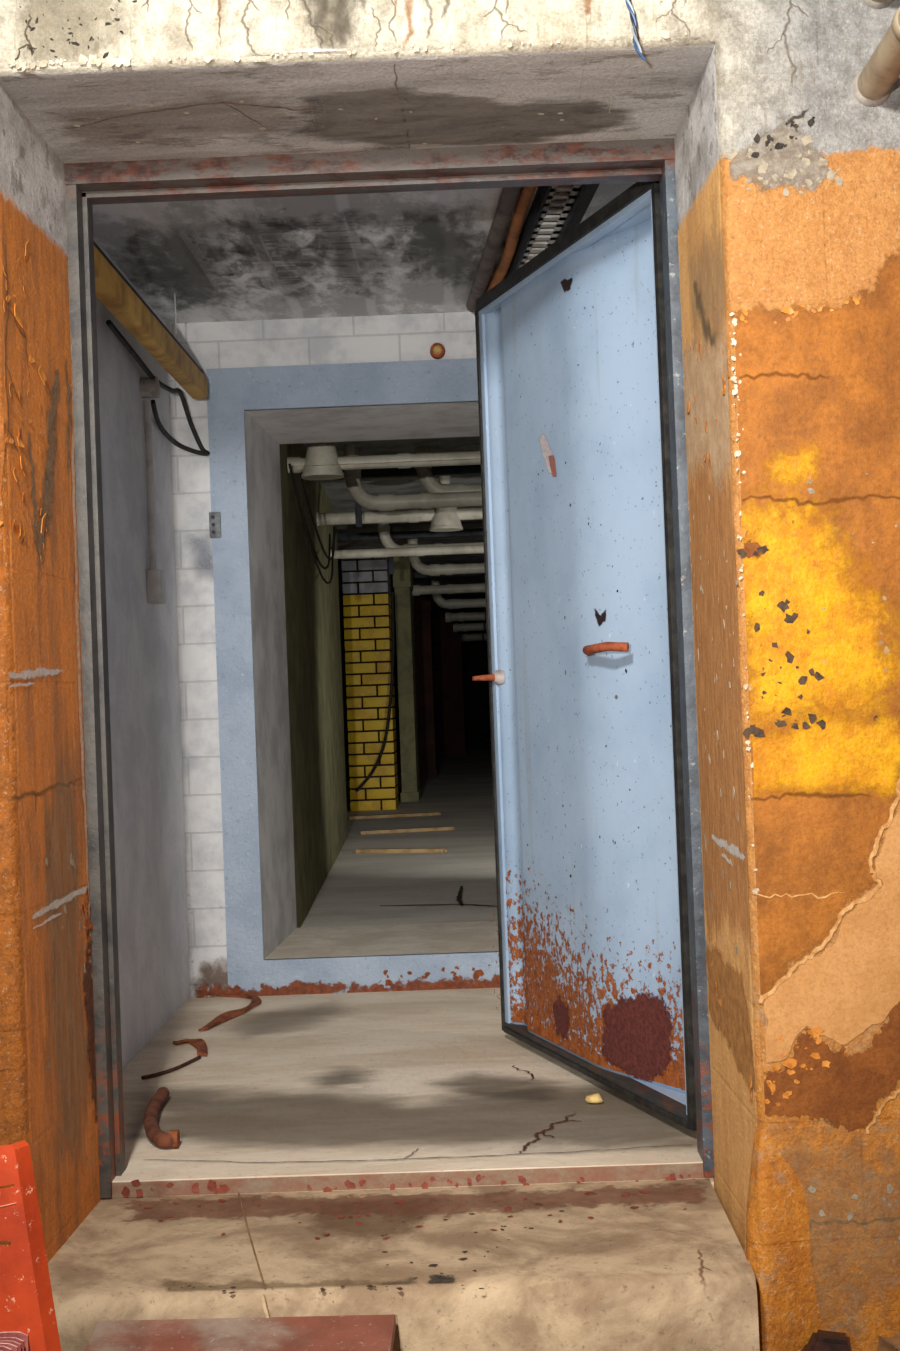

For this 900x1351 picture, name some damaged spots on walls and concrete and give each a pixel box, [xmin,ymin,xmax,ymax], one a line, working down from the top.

leakage [309,0,350,42]